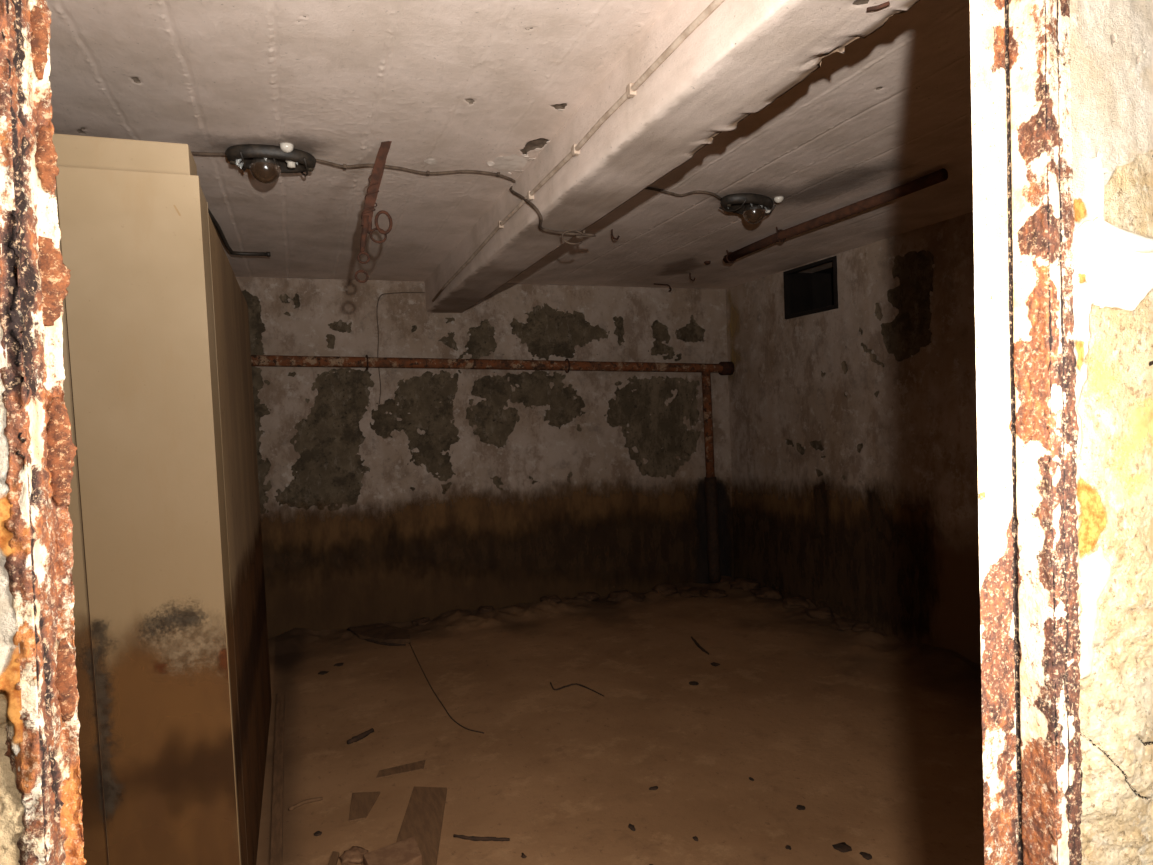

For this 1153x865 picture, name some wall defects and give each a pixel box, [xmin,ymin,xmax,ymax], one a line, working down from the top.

rust [30,5,49,80]
rust [35,126,59,192]
rust [38,236,71,326]
spalling [648,315,706,361]
rust [46,397,77,506]
spalling [242,290,625,514]
spalling [604,375,701,479]
spalling [1074,149,1153,865]
rust [55,638,78,722]
water stain [74,481,935,865]
spalling [0,691,25,865]
crack [1080,733,1148,800]